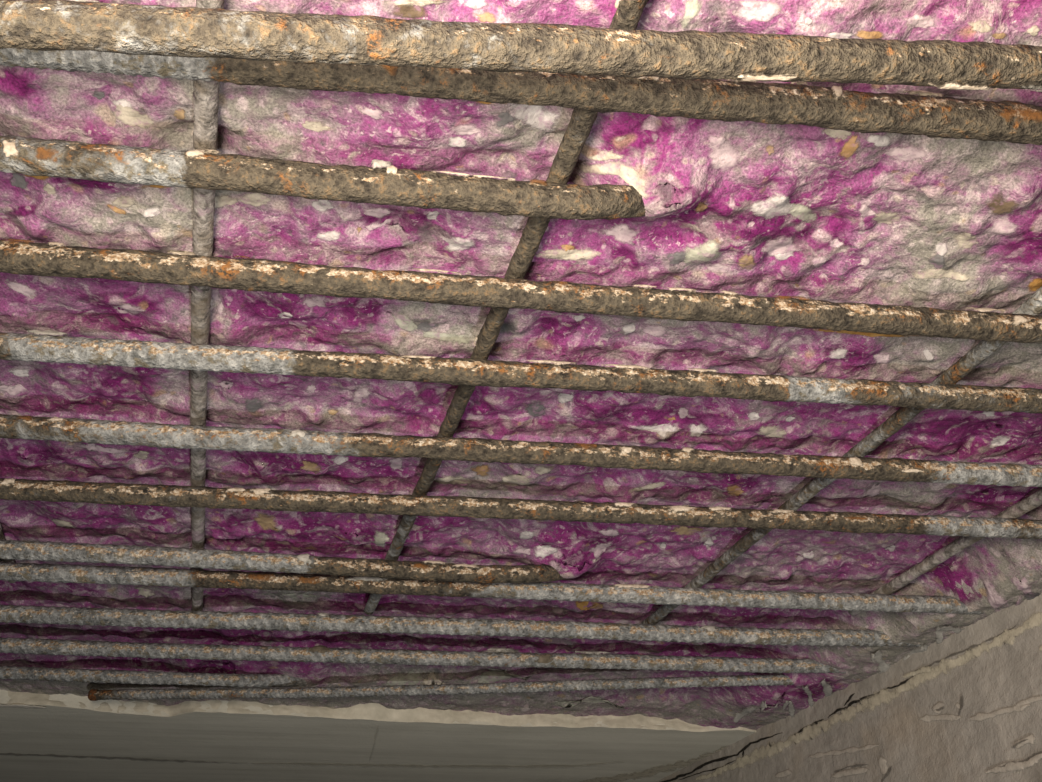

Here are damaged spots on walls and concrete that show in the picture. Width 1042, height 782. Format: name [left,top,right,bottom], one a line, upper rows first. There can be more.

spalling [0,0,1042,106]
spalling [0,48,1042,313]
spalling [0,239,1042,733]
crack [661,625,1016,782]